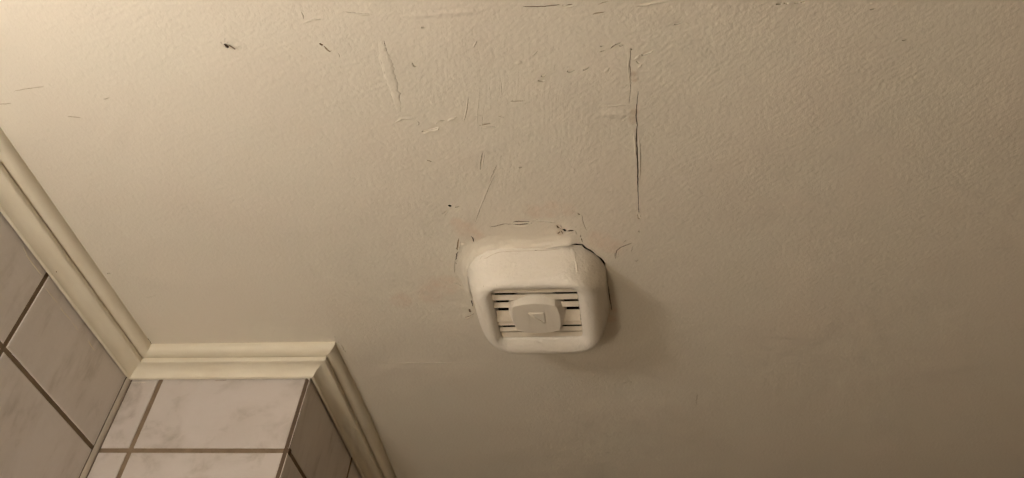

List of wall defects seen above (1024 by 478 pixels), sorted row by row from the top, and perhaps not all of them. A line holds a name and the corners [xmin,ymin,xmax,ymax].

crack [627,49,641,219]
crack [453,224,633,309]